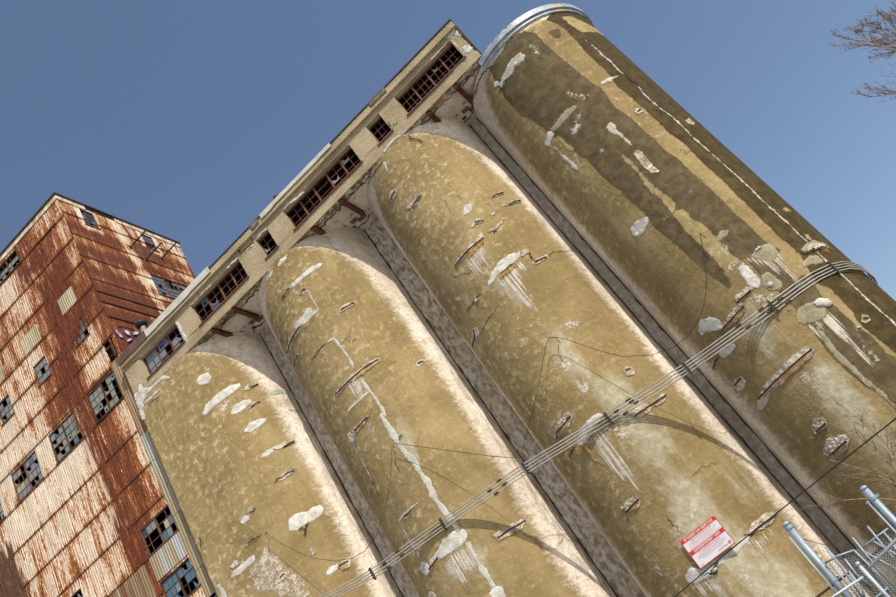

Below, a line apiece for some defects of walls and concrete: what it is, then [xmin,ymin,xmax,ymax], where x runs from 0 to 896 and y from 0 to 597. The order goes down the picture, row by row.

spalling [454,186,521,267]
leakage [489,12,896,404]
leakage [466,244,491,277]
spalling [717,281,775,330]
spalling [335,358,380,396]
spalling [757,346,836,410]
corrosion [16,244,147,572]
spalling [606,394,666,454]
spalling [811,417,850,460]
spalling [493,519,526,541]
corrosion [0,541,31,597]
leakage [445,548,477,586]